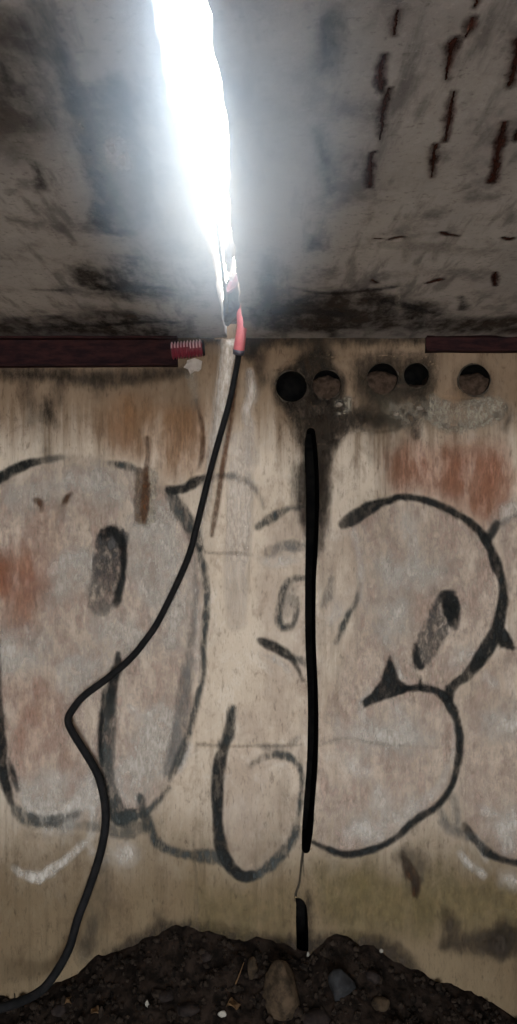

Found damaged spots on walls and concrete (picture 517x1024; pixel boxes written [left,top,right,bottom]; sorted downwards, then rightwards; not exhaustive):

rust [391,9,400,36]
rust [444,0,480,80]
rust [506,38,517,88]
rust [364,53,393,188]
rust [428,91,457,178]
rust [486,121,517,184]
damp [245,255,517,550]